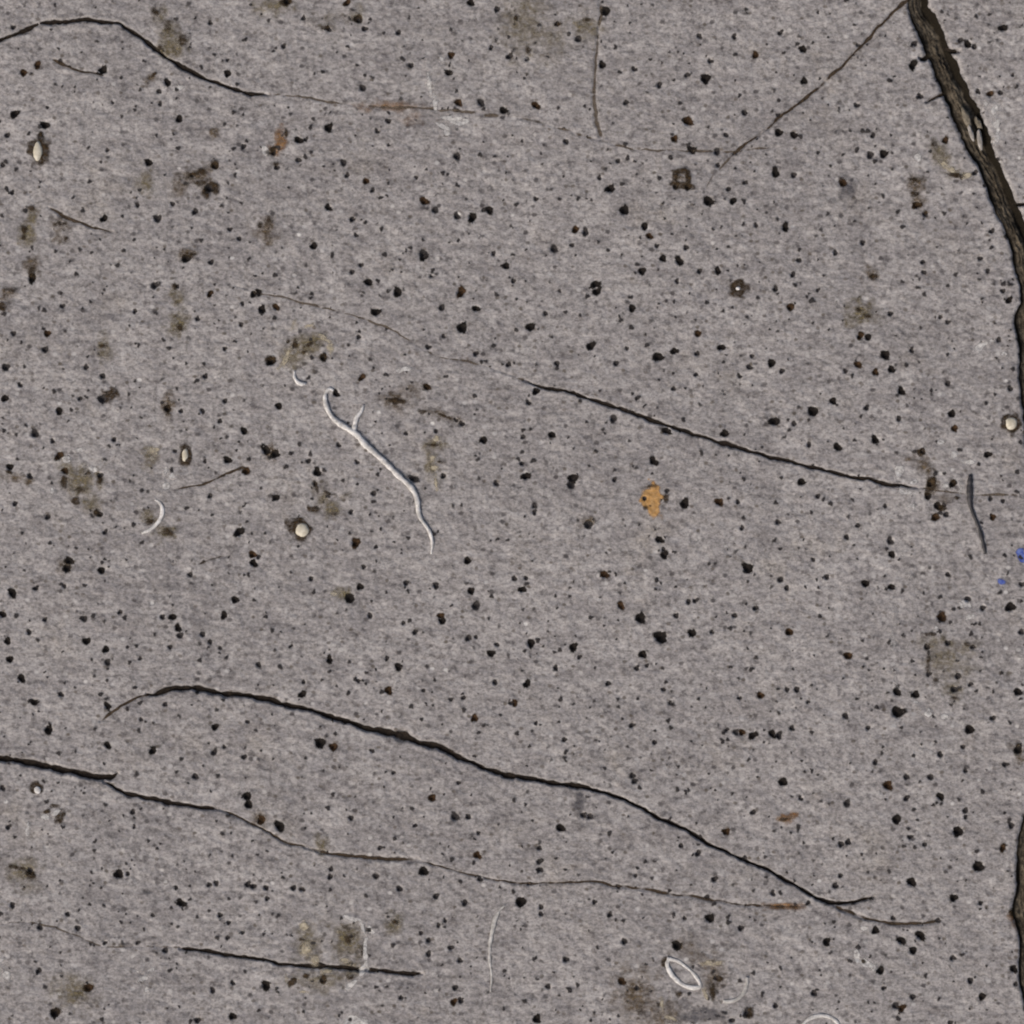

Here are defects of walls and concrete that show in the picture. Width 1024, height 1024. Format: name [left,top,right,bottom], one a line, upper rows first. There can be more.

crack [0,17,340,104]
crack [369,105,498,117]
crack [525,0,1024,420]
crack [254,292,478,365]
crack [518,378,1014,496]
rust [639,479,668,517]
crack [0,685,937,925]
crack [9,922,421,976]
crack [1012,816,1024,1001]